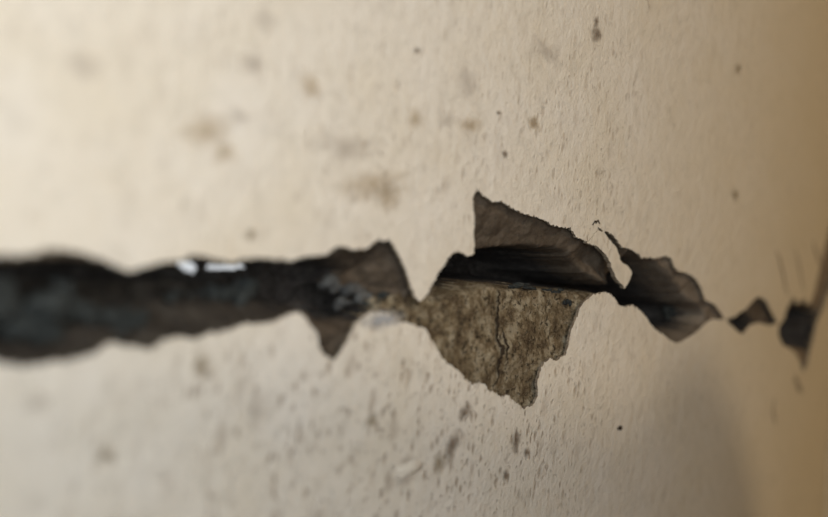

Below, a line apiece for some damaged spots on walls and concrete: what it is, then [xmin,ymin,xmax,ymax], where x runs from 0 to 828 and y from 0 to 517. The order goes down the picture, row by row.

crack [0,256,368,323]
spalling [0,192,774,408]
crack [433,247,589,293]
crack [772,236,828,393]